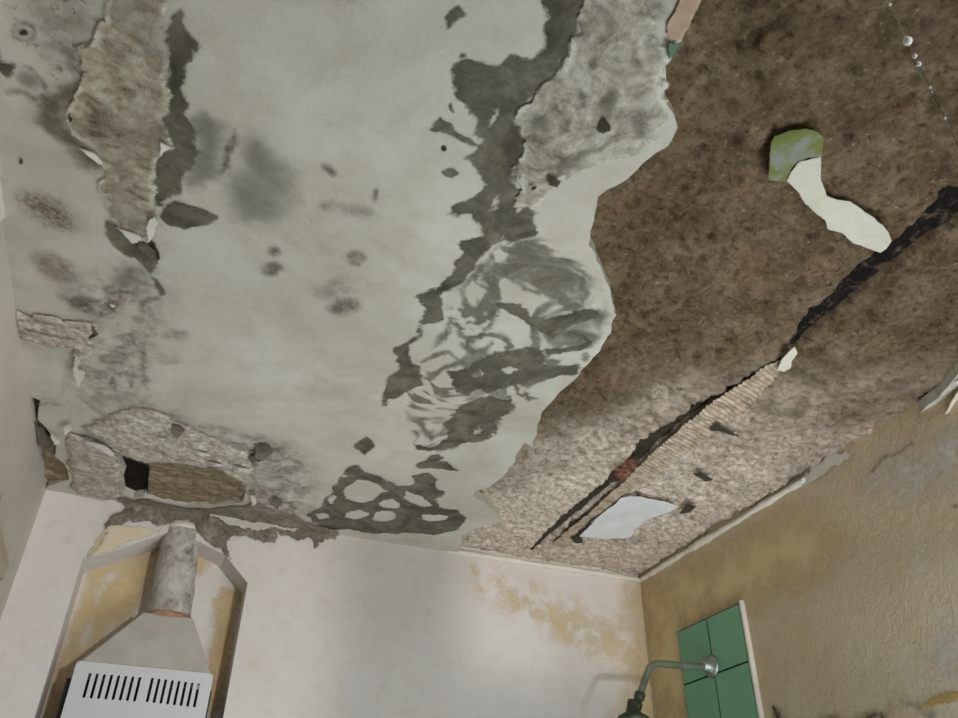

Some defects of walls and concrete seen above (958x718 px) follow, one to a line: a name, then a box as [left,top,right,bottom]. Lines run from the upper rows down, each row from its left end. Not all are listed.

damp [23,196,71,228]
damp [0,0,99,168]
peeling [16,311,99,387]
damp [69,296,114,315]
peeling [66,0,174,266]
damp [106,221,166,307]
damp [154,11,236,230]
damp [307,0,605,535]
spalling [460,0,958,575]
flaking render [33,398,316,532]